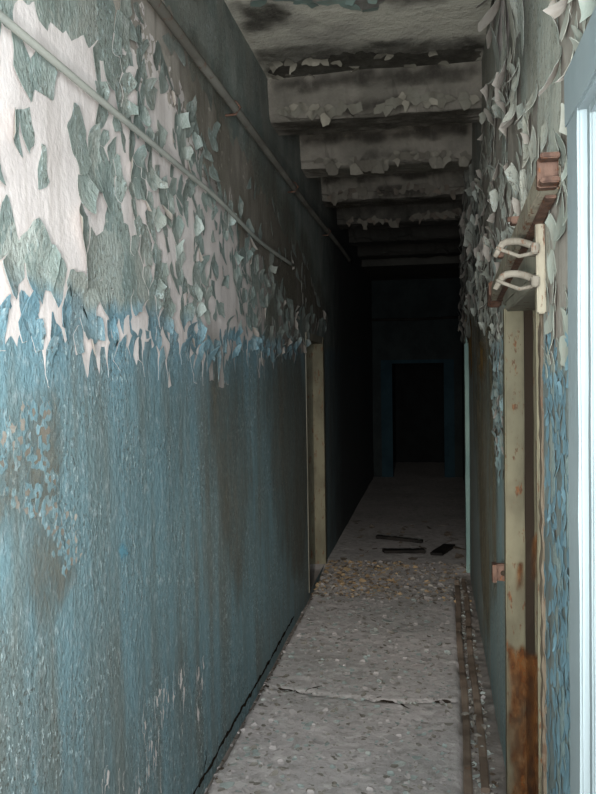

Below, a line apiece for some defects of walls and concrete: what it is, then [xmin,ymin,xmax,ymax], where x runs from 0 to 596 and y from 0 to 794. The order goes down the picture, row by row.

peeling [0,0,327,388]
peeling [250,0,596,794]
crack [380,699,451,708]
corrosion [509,647,538,794]